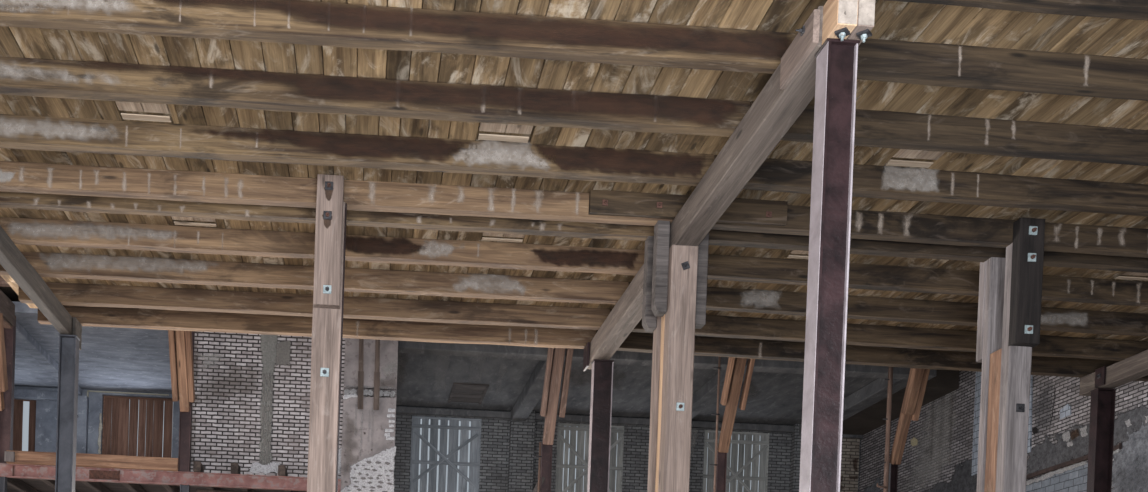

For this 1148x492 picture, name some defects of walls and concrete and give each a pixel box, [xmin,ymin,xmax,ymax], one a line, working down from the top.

water stain [346,236,421,254]
water stain [535,250,638,268]
peeling [340,386,397,492]
spalling [1062,426,1088,447]
spalling [1026,461,1087,486]